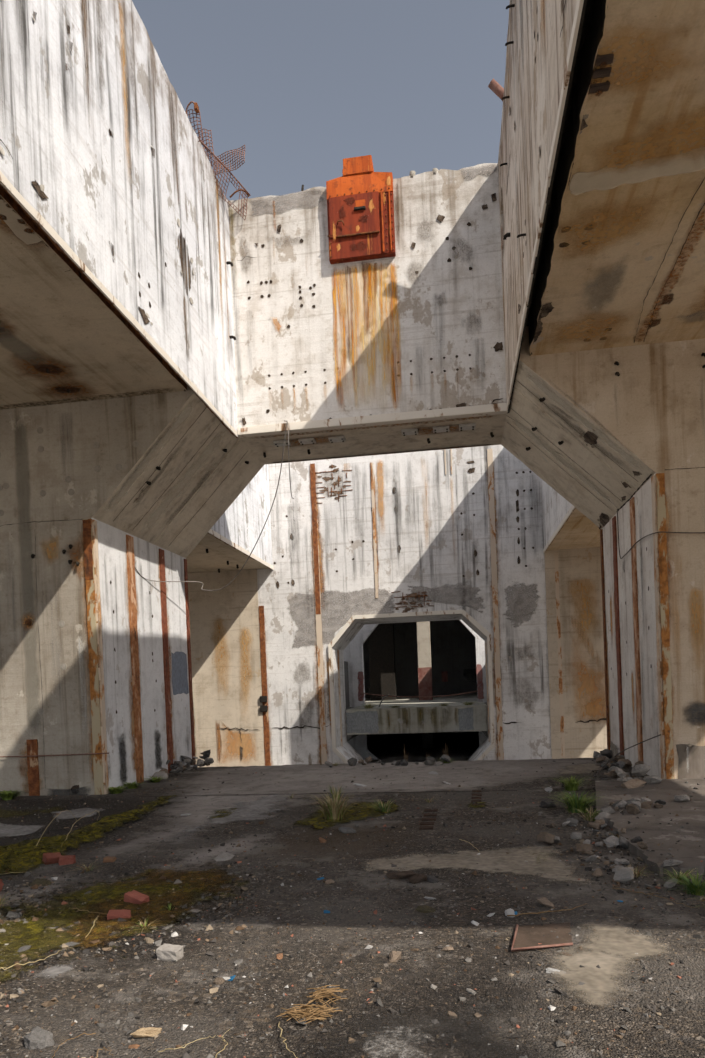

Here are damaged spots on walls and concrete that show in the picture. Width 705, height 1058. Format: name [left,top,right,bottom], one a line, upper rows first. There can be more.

corrosion [333,262,401,403]